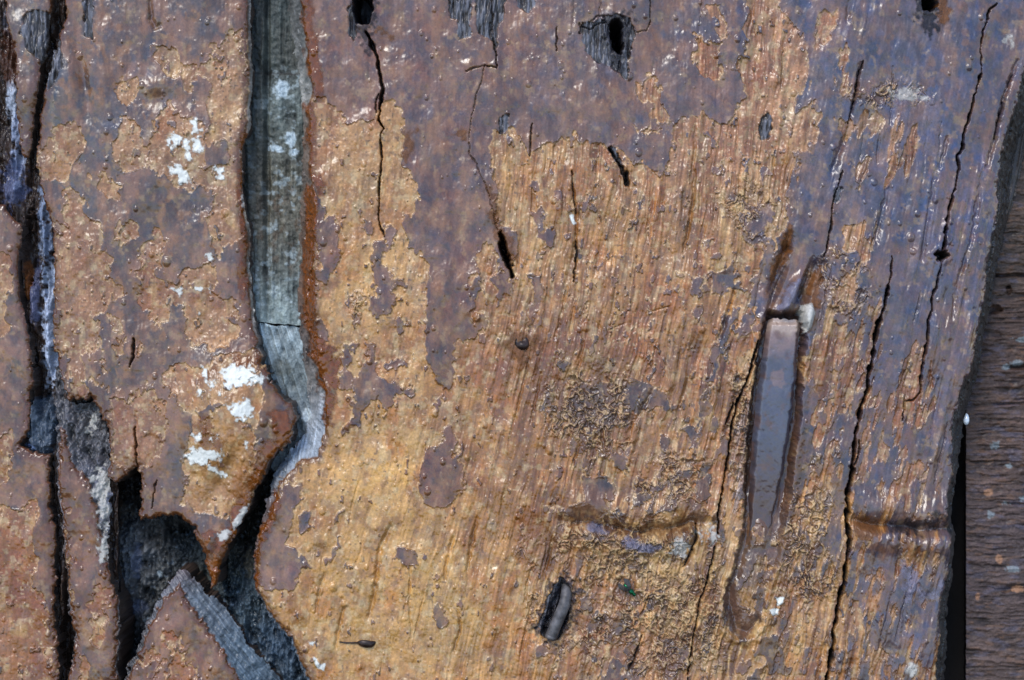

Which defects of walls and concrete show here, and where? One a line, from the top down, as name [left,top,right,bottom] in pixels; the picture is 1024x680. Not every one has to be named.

peeling [37,28,266,471]
peeling [179,451,254,523]
crack [367,31,386,238]
crack [466,0,498,229]
peeling [254,0,919,680]
crack [682,340,759,680]
crack [825,255,894,680]
crack [902,3,1015,423]